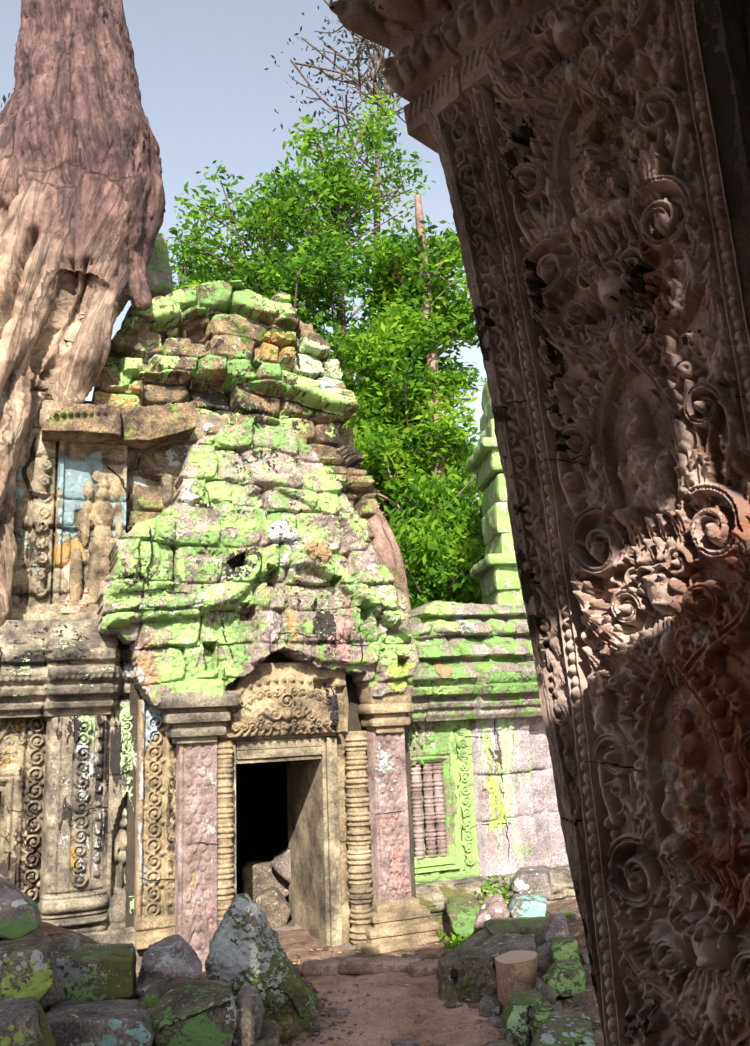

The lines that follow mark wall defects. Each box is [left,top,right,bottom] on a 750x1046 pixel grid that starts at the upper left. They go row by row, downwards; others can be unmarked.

damp [473,306,497,364]
damp [492,406,512,423]
spalling [49,451,103,567]
spalling [109,497,126,537]
crack [127,526,191,594]
damp [513,504,550,688]
damp [0,718,44,895]
damp [58,773,78,894]
damp [52,710,123,849]
damp [488,747,504,765]
damp [575,880,598,994]